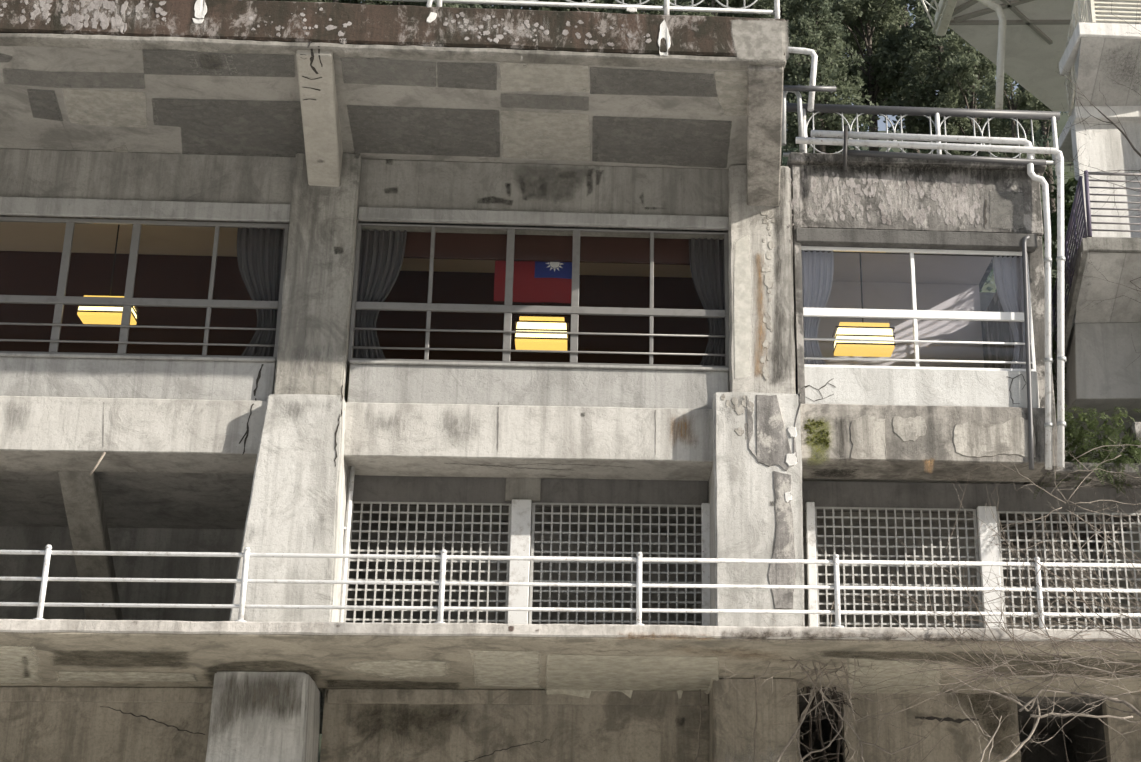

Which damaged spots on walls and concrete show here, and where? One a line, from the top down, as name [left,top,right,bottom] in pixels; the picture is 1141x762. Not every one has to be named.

peeling [0,0,167,34]
peeling [192,0,207,24]
crack [300,41,323,100]
leakage [341,57,732,205]
rust [755,255,764,374]
flaking render [760,170,984,380]
crack [239,364,264,455]
crack [334,385,345,467]
flaking render [850,414,927,460]
flaking render [953,415,1036,458]
flaking render [721,392,801,609]
crack [100,706,205,735]